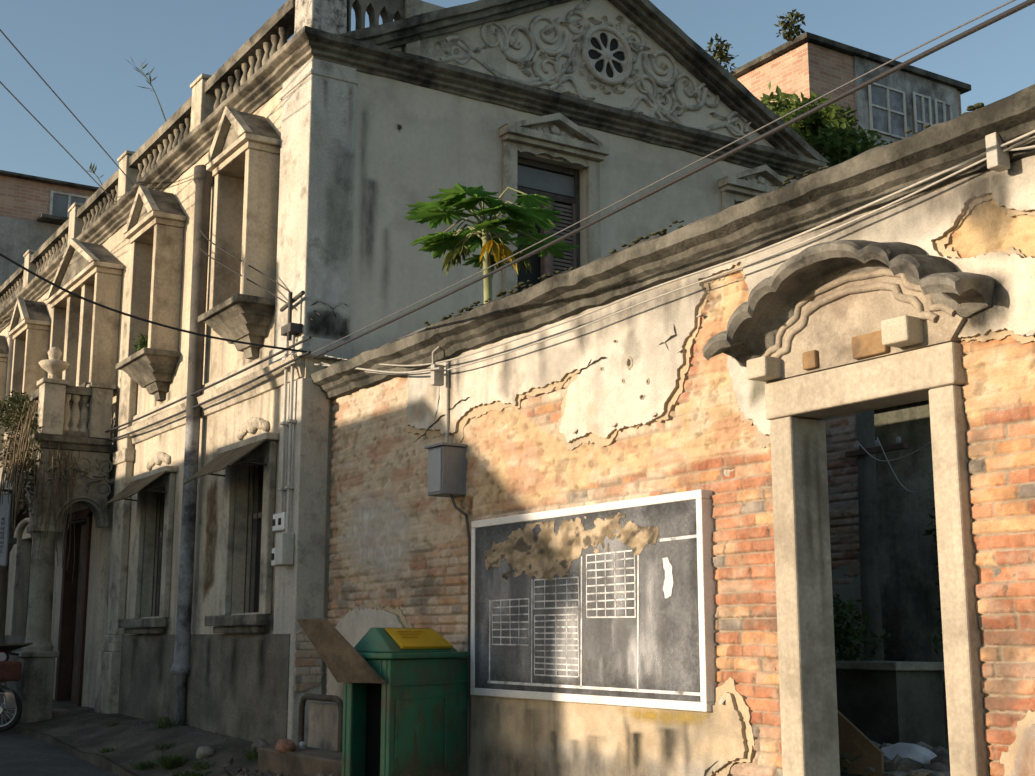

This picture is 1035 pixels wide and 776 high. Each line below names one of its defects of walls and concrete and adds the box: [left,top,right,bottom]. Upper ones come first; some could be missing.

water stain [308,272,348,337]
flaking render [327,270,783,776]
flaking render [946,199,1035,258]
flaking render [959,330,1035,776]